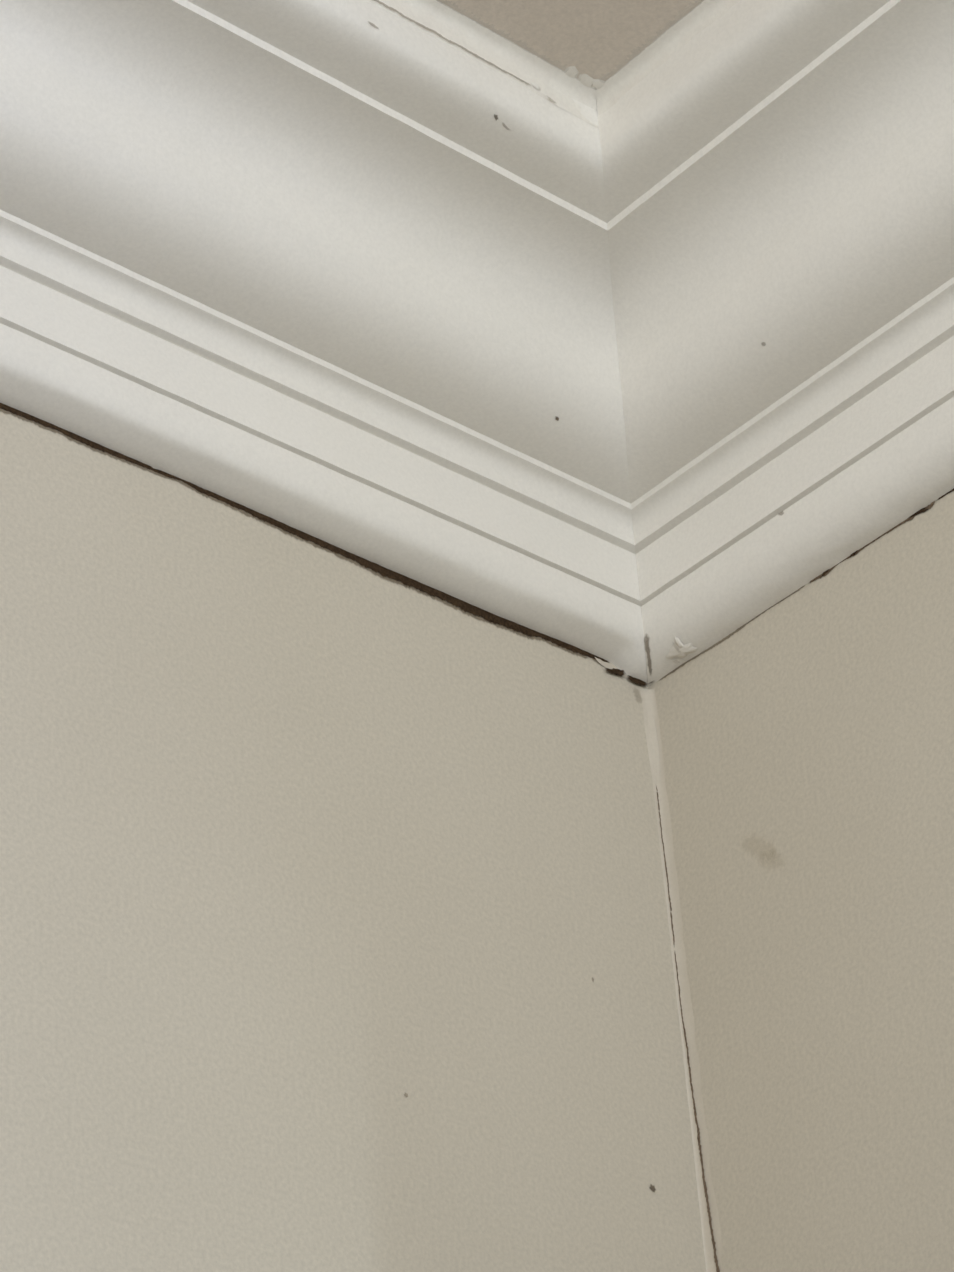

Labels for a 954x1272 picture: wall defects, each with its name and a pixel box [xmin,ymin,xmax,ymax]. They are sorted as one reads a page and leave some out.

crack [0,403,609,666]
crack [645,488,954,679]
crack [656,786,720,1272]